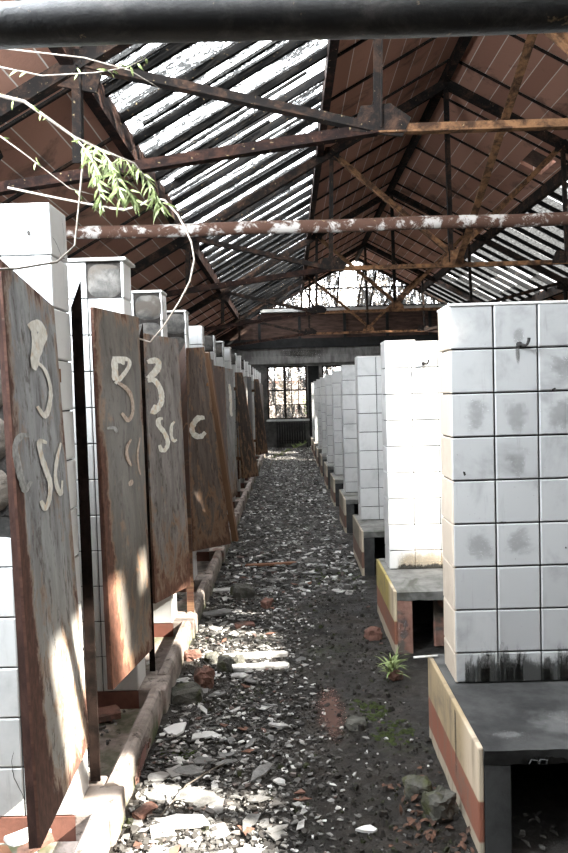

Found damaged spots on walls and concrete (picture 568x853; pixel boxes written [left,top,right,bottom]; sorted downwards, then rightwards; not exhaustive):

mould [465,651,568,682]